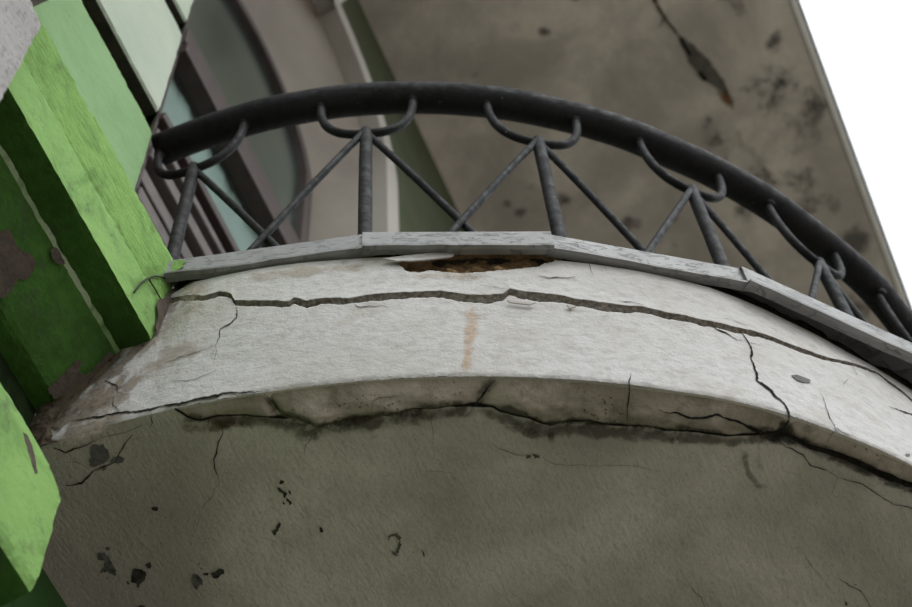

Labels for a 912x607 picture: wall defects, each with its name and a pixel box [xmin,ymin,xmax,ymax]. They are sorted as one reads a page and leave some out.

crack [653,0,679,36]
water stain [845,231,868,252]
peeling [0,229,35,298]
spalling [383,253,563,274]
crack [34,264,912,525]
water stain [191,401,466,439]
spalling [89,444,124,471]
water stain [488,405,912,493]
peeling [97,547,116,579]
peeling [127,562,152,588]
peeling [191,564,224,591]